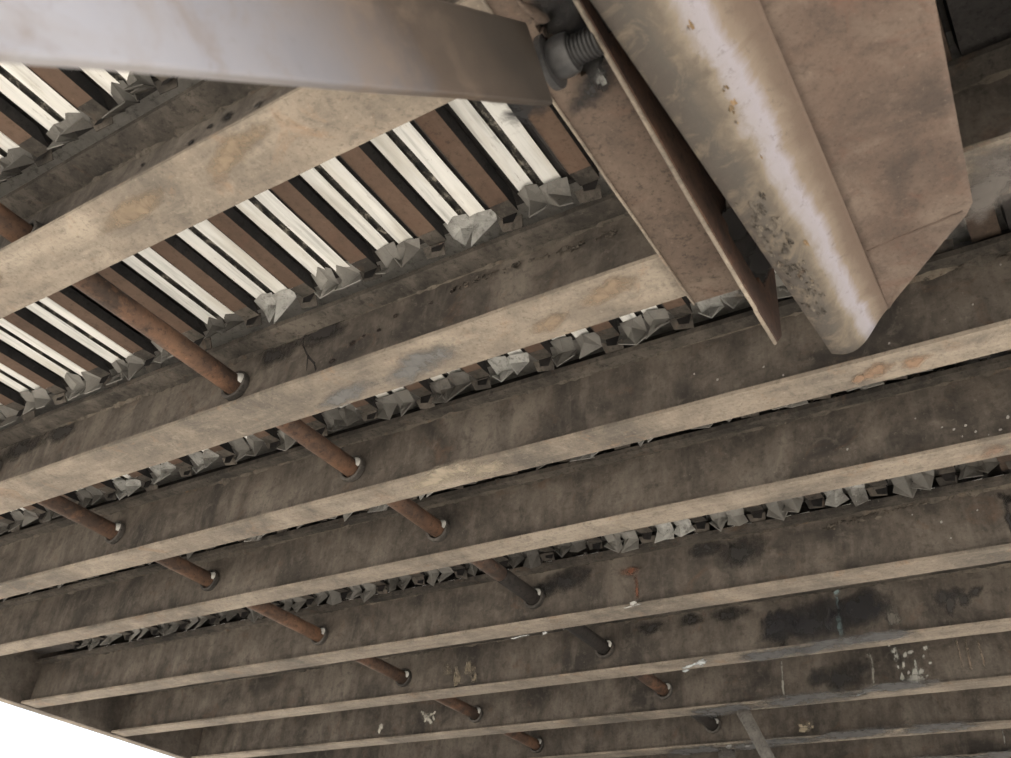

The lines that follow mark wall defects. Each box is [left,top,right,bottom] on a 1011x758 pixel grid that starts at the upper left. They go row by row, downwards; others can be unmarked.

damp [998,493,1011,532]
damp [935,587,982,615]
damp [692,588,936,716]